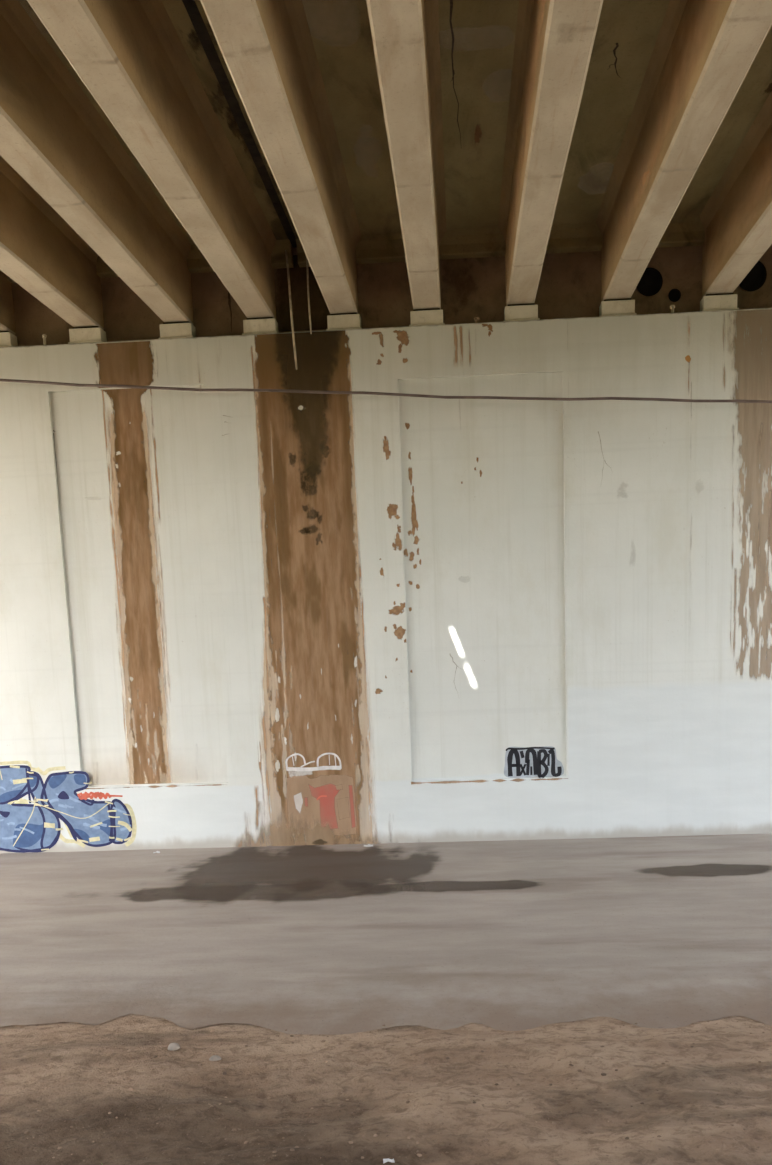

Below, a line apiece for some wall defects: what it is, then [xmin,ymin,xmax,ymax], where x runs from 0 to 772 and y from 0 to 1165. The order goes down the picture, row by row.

corrosion [94,341,177,788]
corrosion [251,330,370,843]
corrosion [723,309,772,678]